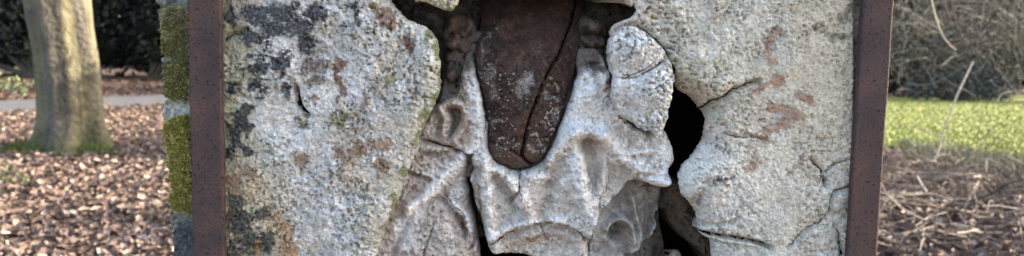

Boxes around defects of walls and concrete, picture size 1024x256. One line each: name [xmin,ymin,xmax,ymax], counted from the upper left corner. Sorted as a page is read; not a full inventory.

crack [489,0,577,202]
crack [692,81,755,108]
crack [695,160,849,254]